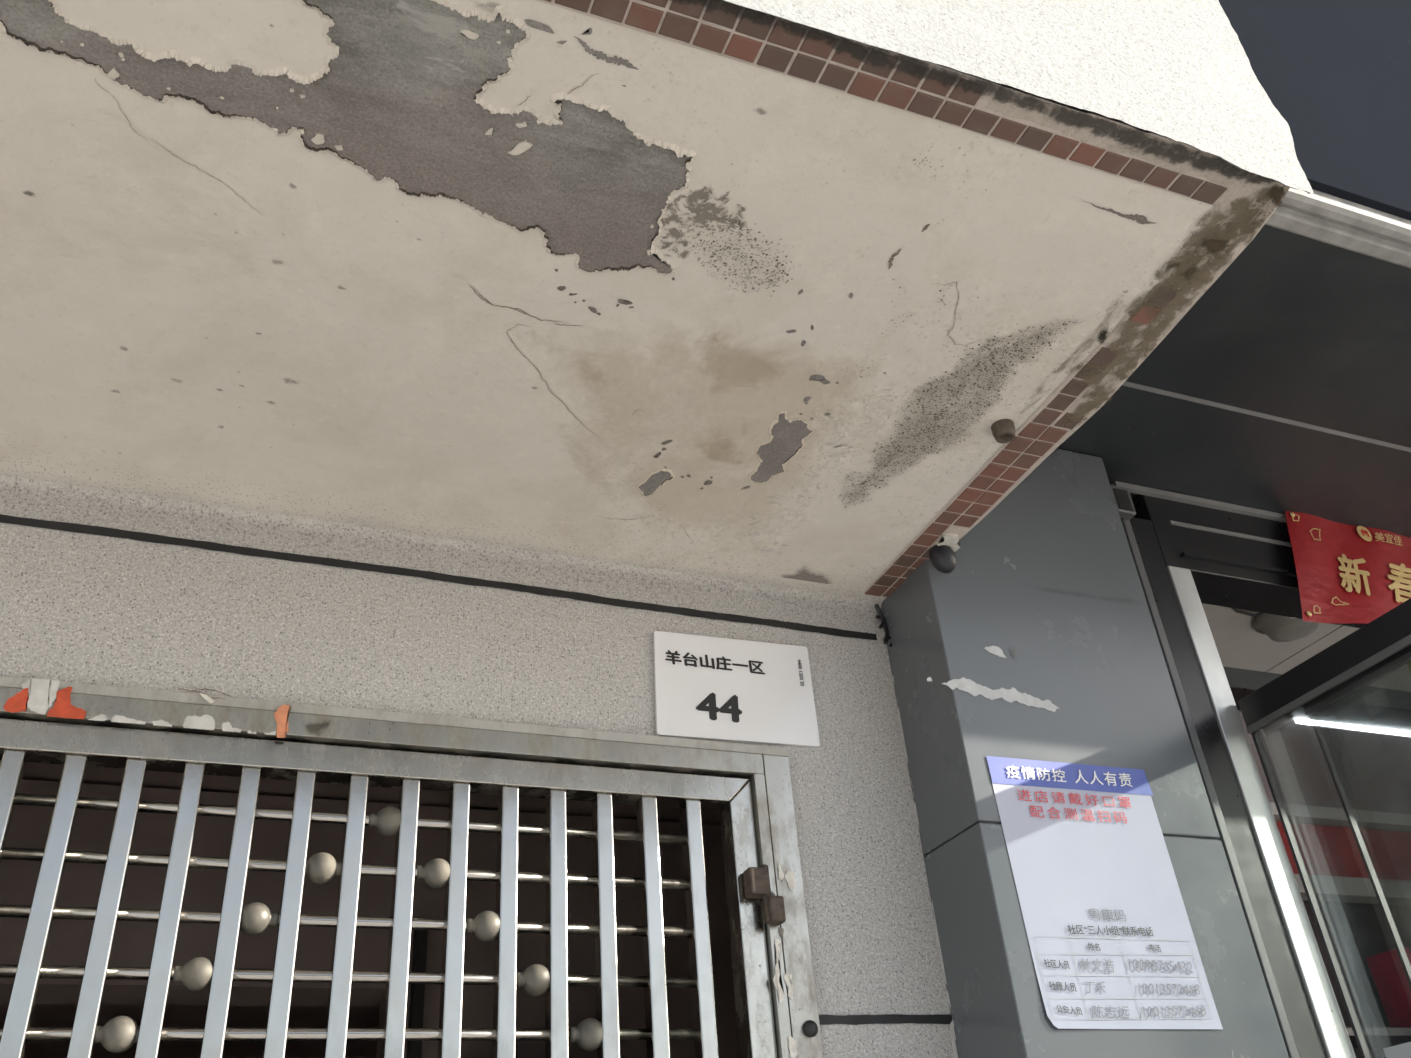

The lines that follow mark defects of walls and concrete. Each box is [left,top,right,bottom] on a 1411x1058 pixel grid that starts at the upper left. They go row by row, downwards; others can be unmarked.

peeling [0,0,803,316]
crack [466,284,597,436]
peeling [635,440,713,498]
peeling [741,374,839,490]
leakage [841,319,1081,507]
leakage [1065,185,1286,430]